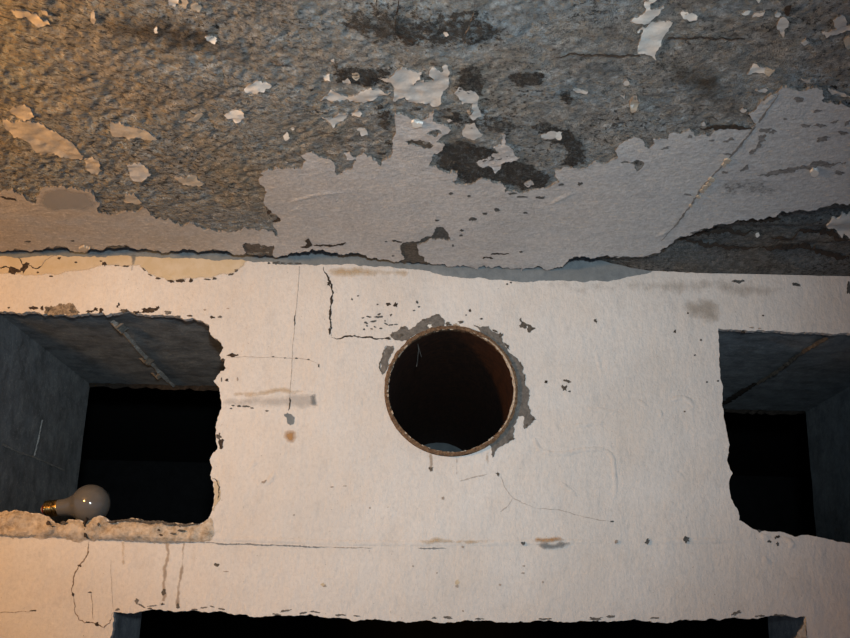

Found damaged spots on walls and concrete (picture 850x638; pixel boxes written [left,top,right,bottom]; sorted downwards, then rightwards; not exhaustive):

peeling [9,9,53,28]
peeling [168,0,202,12]
peeling [0,63,850,294]
crack [661,92,779,241]
crack [232,239,345,425]
crack [323,267,391,340]
peeling [362,302,471,375]
peeling [474,318,536,457]
spalling [0,478,221,544]
crack [71,542,113,628]